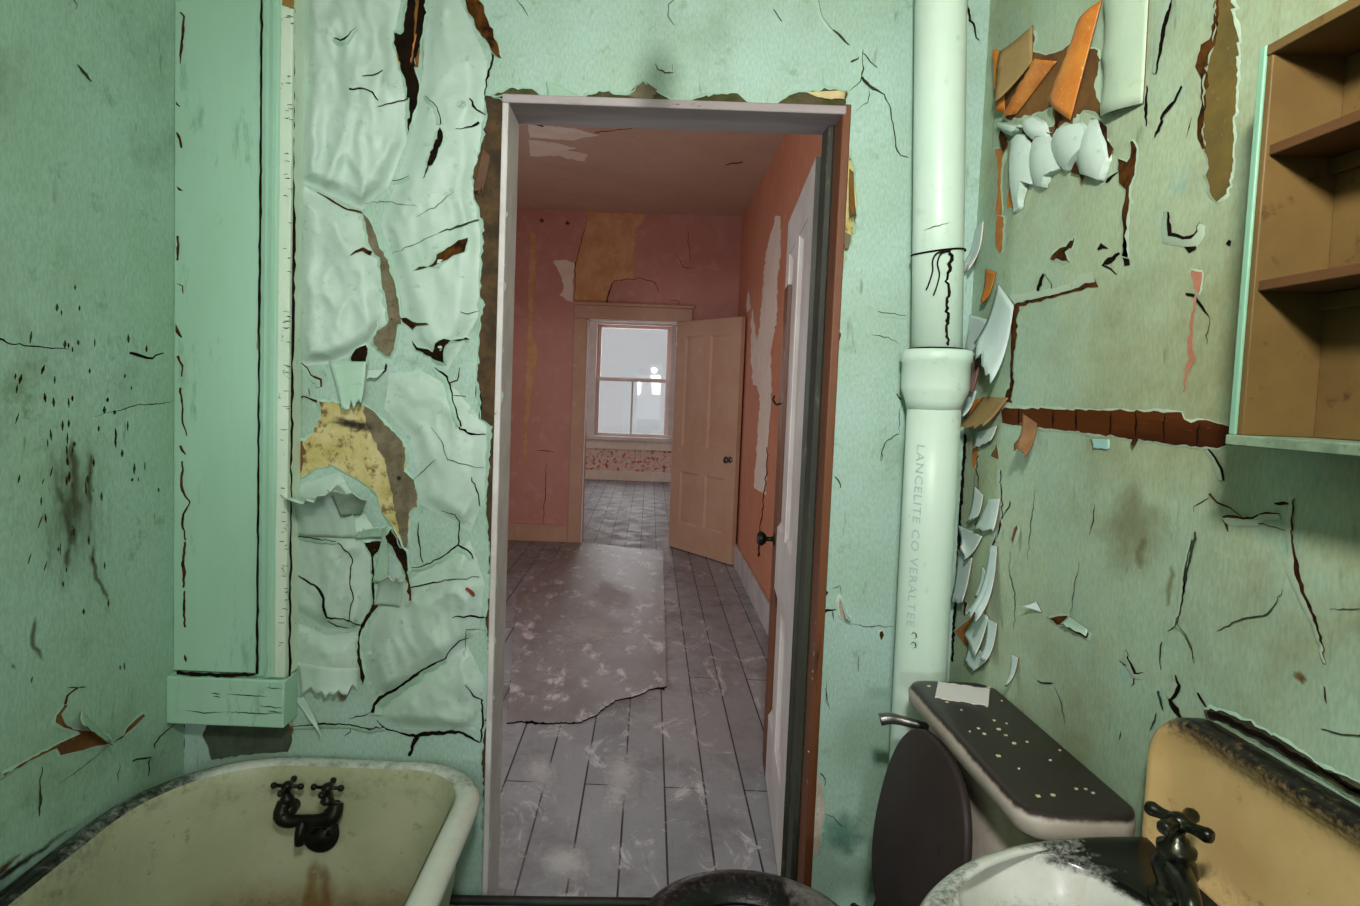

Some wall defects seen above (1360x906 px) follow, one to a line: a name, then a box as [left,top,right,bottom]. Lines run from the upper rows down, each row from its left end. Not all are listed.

crack [815,0,908,158]
peeling [992,0,1112,214]
peeling [1201,0,1242,204]
water stain [28,365,109,607]
water stain [98,397,145,482]
flaking render [300,398,419,549]
flaking render [465,78,749,674]
crack [956,434,1035,627]
crack [1005,243,1120,403]
crack [1161,211,1231,253]
crack [1119,449,1360,740]
spalling [1203,704,1360,803]